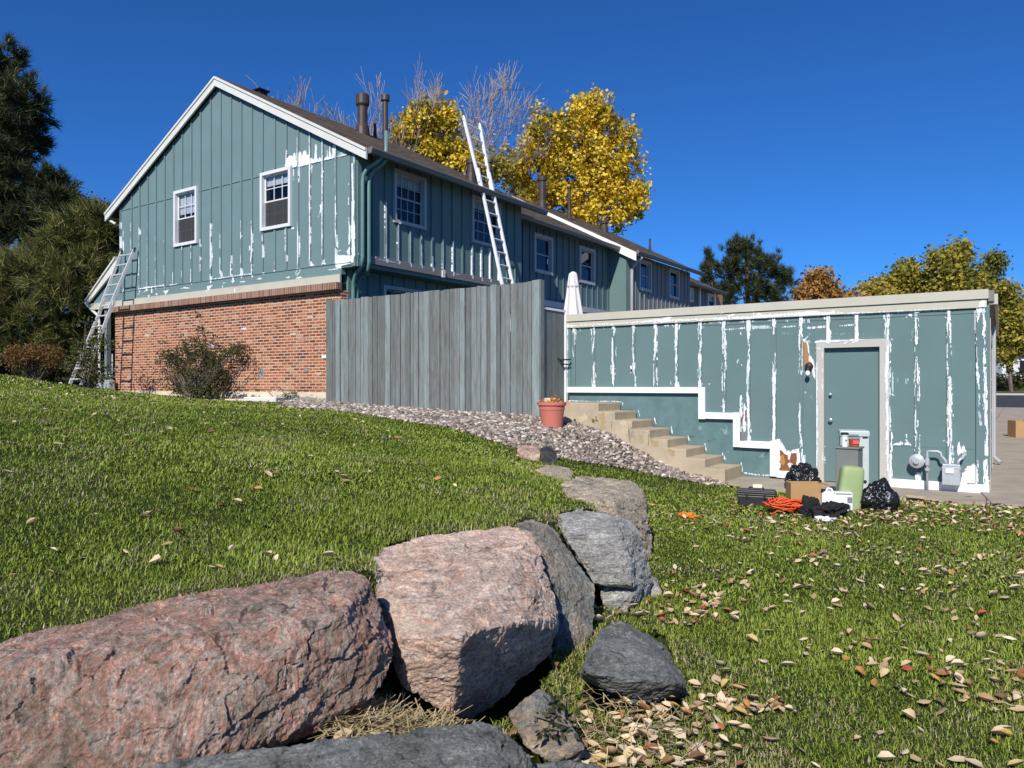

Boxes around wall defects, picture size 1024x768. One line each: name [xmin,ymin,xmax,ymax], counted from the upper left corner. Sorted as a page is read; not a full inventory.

peeling [803,342,811,365]